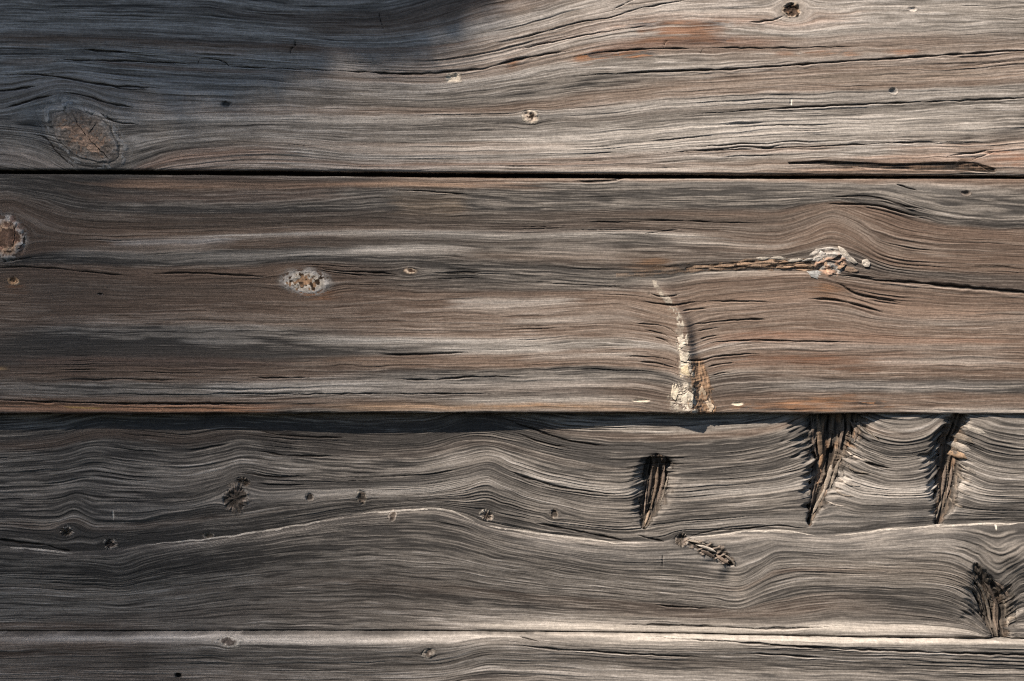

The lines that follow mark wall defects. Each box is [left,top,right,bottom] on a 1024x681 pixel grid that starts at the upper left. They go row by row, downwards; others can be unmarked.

crack [674,141,992,165]
crack [630,294,857,376]
crack [690,413,888,537]
crack [929,413,987,526]
crack [514,562,1024,658]